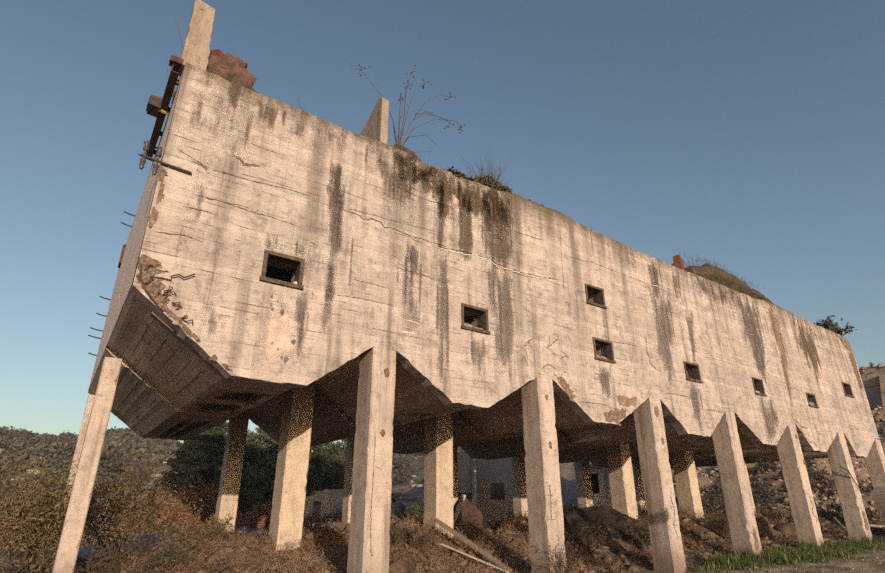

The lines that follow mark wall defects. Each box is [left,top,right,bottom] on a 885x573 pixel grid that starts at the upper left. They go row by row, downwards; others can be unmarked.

leakage [324,166,344,320]
crack [342,208,659,287]
spalling [136,254,201,343]
leakage [737,297,766,379]
leakage [792,316,821,382]